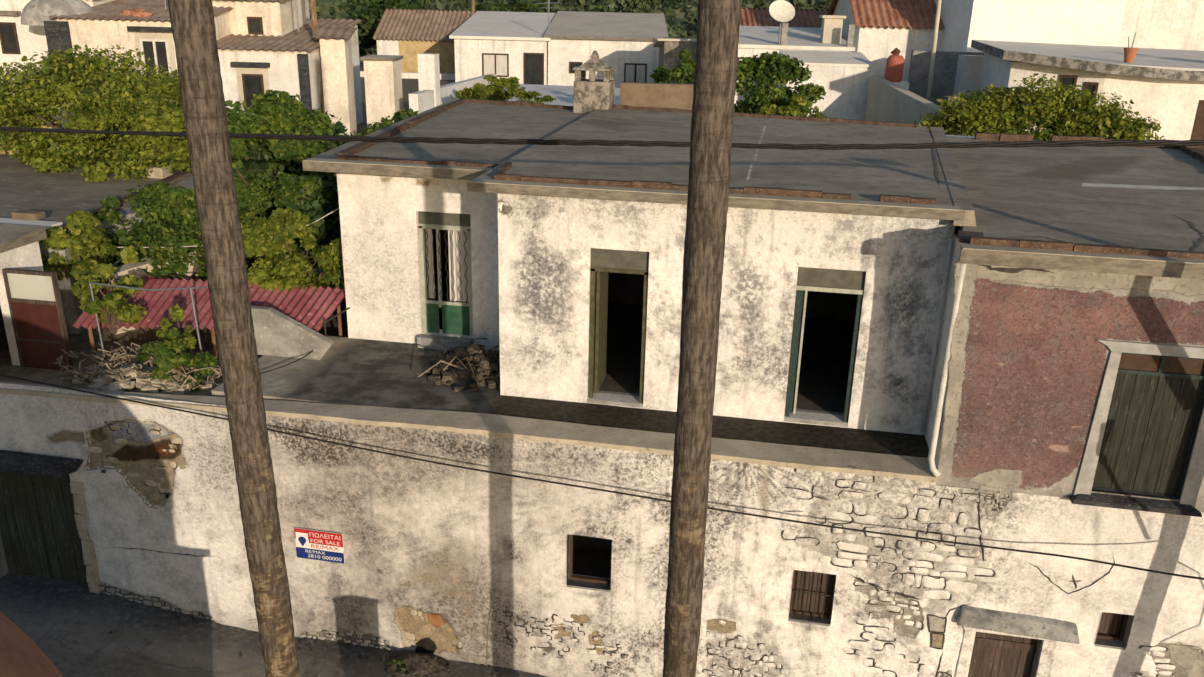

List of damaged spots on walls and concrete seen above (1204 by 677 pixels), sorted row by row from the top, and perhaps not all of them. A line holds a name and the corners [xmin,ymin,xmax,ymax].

crack [1175,215,1204,251]
crack [981,265,1054,273]
spalling [84,419,186,509]
flaking render [794,466,1023,650]
crack [1029,552,1115,594]
spalling [299,606,462,654]
spalling [498,609,634,673]
flaking render [701,619,788,677]
spalling [1131,643,1204,677]